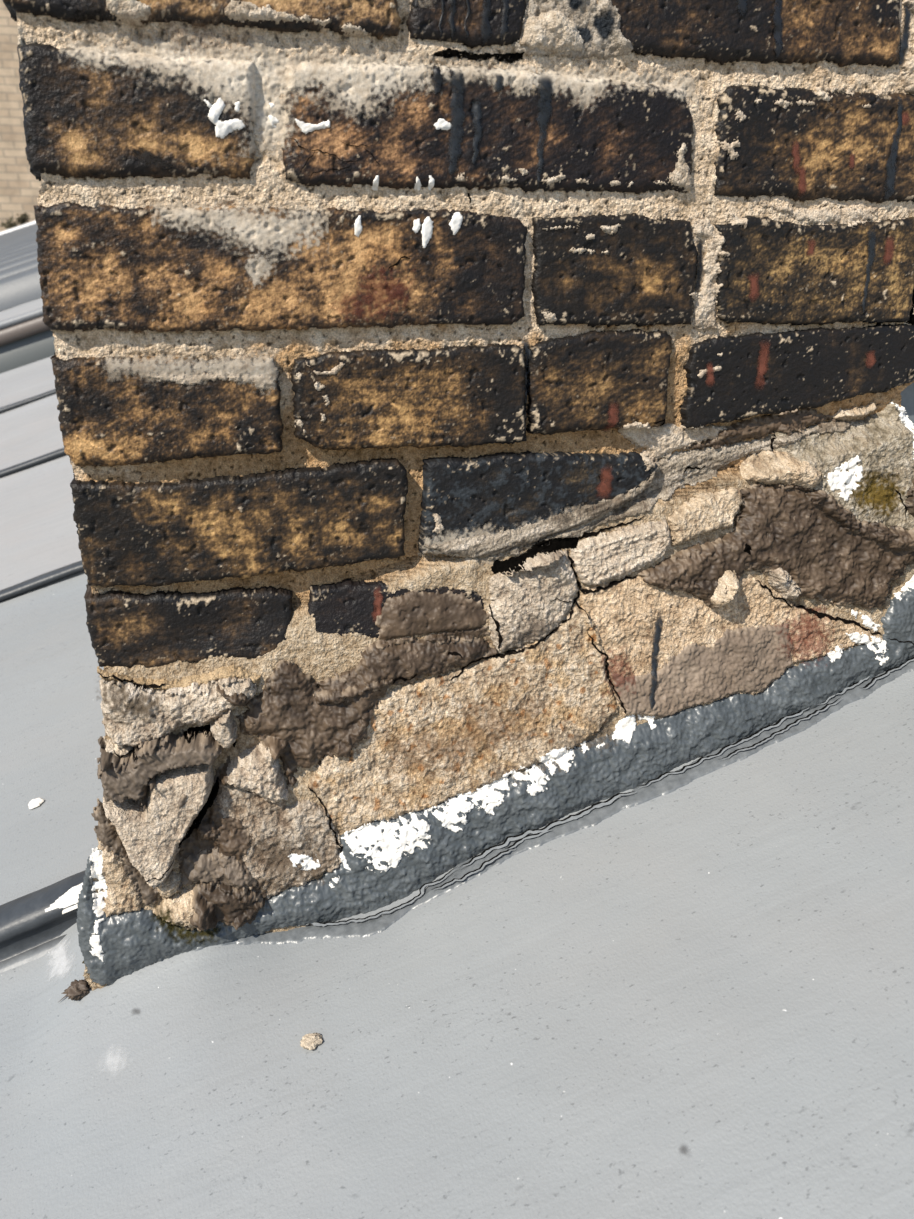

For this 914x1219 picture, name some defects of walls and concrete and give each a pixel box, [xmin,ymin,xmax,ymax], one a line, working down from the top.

peeling [824,455,864,501]
crack [446,515,646,714]
peeling [894,575,914,600]
spalling [176,709,268,900]
crack [297,580,914,927]